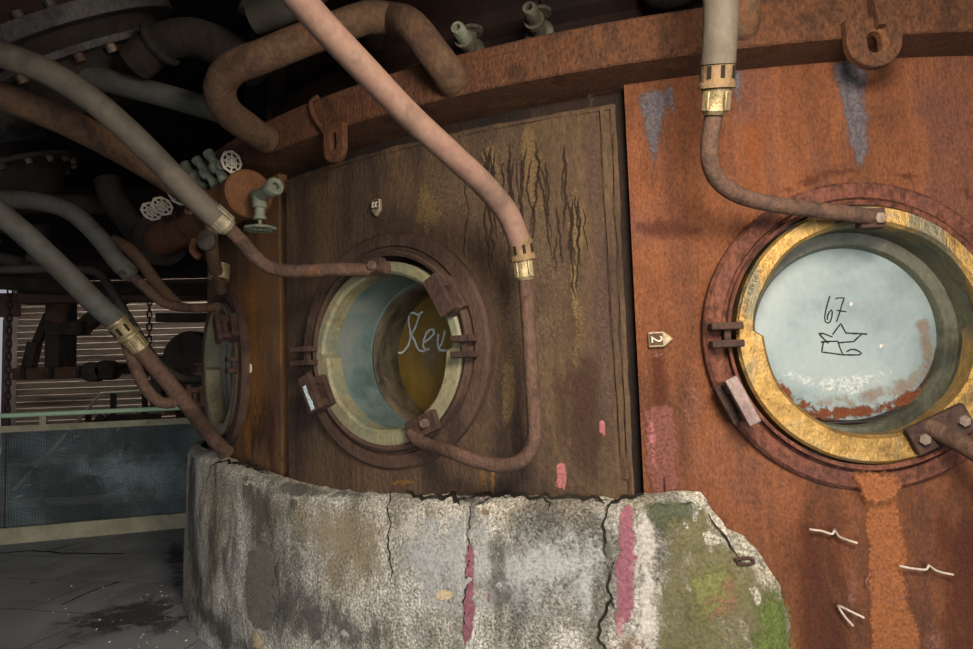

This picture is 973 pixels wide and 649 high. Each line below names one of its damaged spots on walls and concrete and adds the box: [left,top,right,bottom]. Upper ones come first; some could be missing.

corrosion [777,379,925,421]
damp [68,458,255,649]
damp [243,477,270,545]
crack [387,490,741,649]
corrosion [622,638,646,649]
corrosion [855,472,920,649]